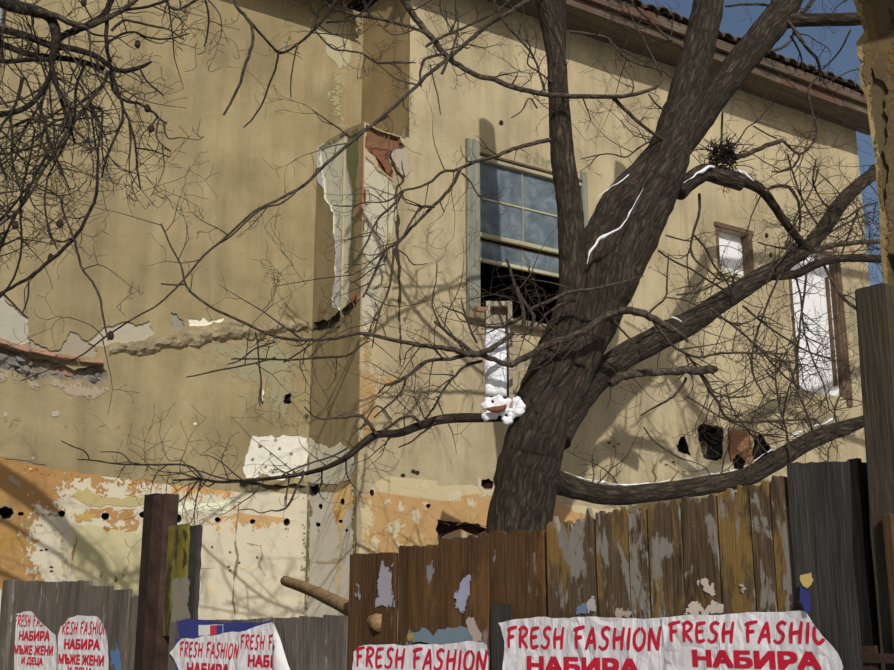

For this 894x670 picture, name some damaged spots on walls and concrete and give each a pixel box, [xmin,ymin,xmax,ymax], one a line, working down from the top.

peeling [871,68,889,207]
peeling [313,120,412,332]
spalling [886,254,894,286]
peeling [0,291,154,385]
peeling [171,312,224,330]
peeling [239,433,355,497]
spalling [665,423,773,477]
peeling [71,486,144,507]
peeling [178,500,230,514]
spalling [436,521,486,541]
peeling [70,524,142,597]